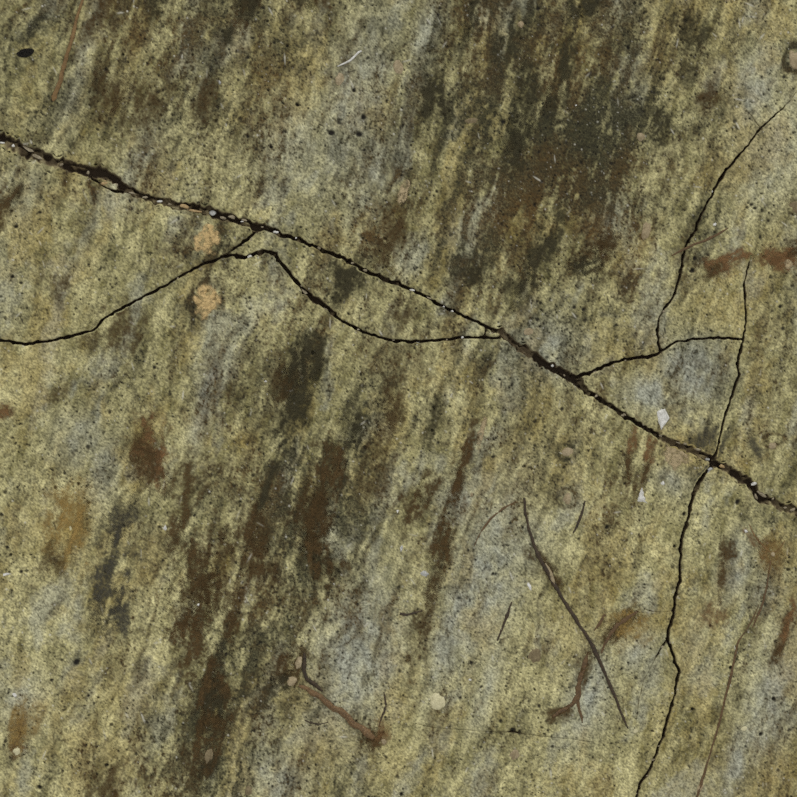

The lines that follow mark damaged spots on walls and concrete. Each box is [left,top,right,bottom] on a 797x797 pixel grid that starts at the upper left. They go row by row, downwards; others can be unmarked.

water stain [419,70,450,126]
water stain [328,261,365,304]
crack [0,89,797,519]
water stain [503,207,565,310]
corrosion [703,239,797,280]
water stain [274,330,329,432]
water stain [290,441,351,580]
water stain [392,470,442,526]
water stain [413,418,479,631]
water stain [166,463,278,790]
crack [633,463,715,797]
crack [416,722,592,744]